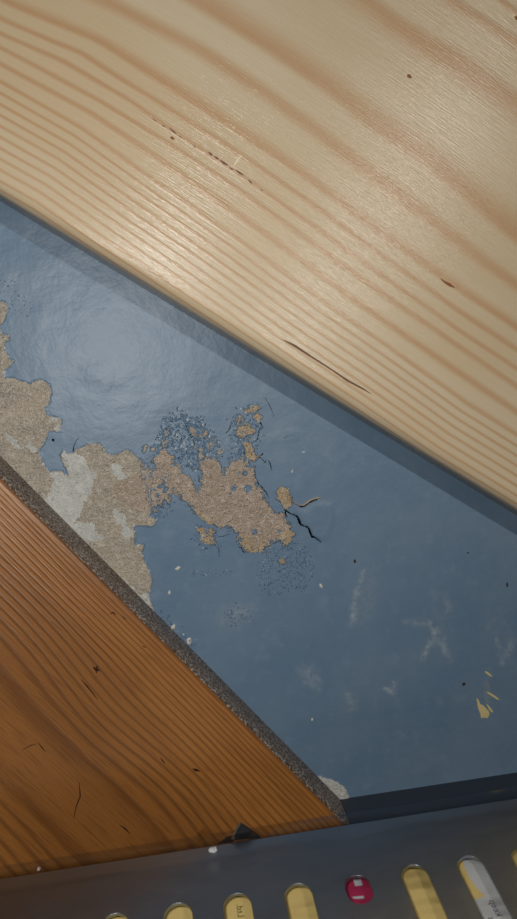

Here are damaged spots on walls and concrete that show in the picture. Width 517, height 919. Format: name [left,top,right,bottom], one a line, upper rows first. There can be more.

peeling [0,280,323,647]
crack [225,401,322,542]